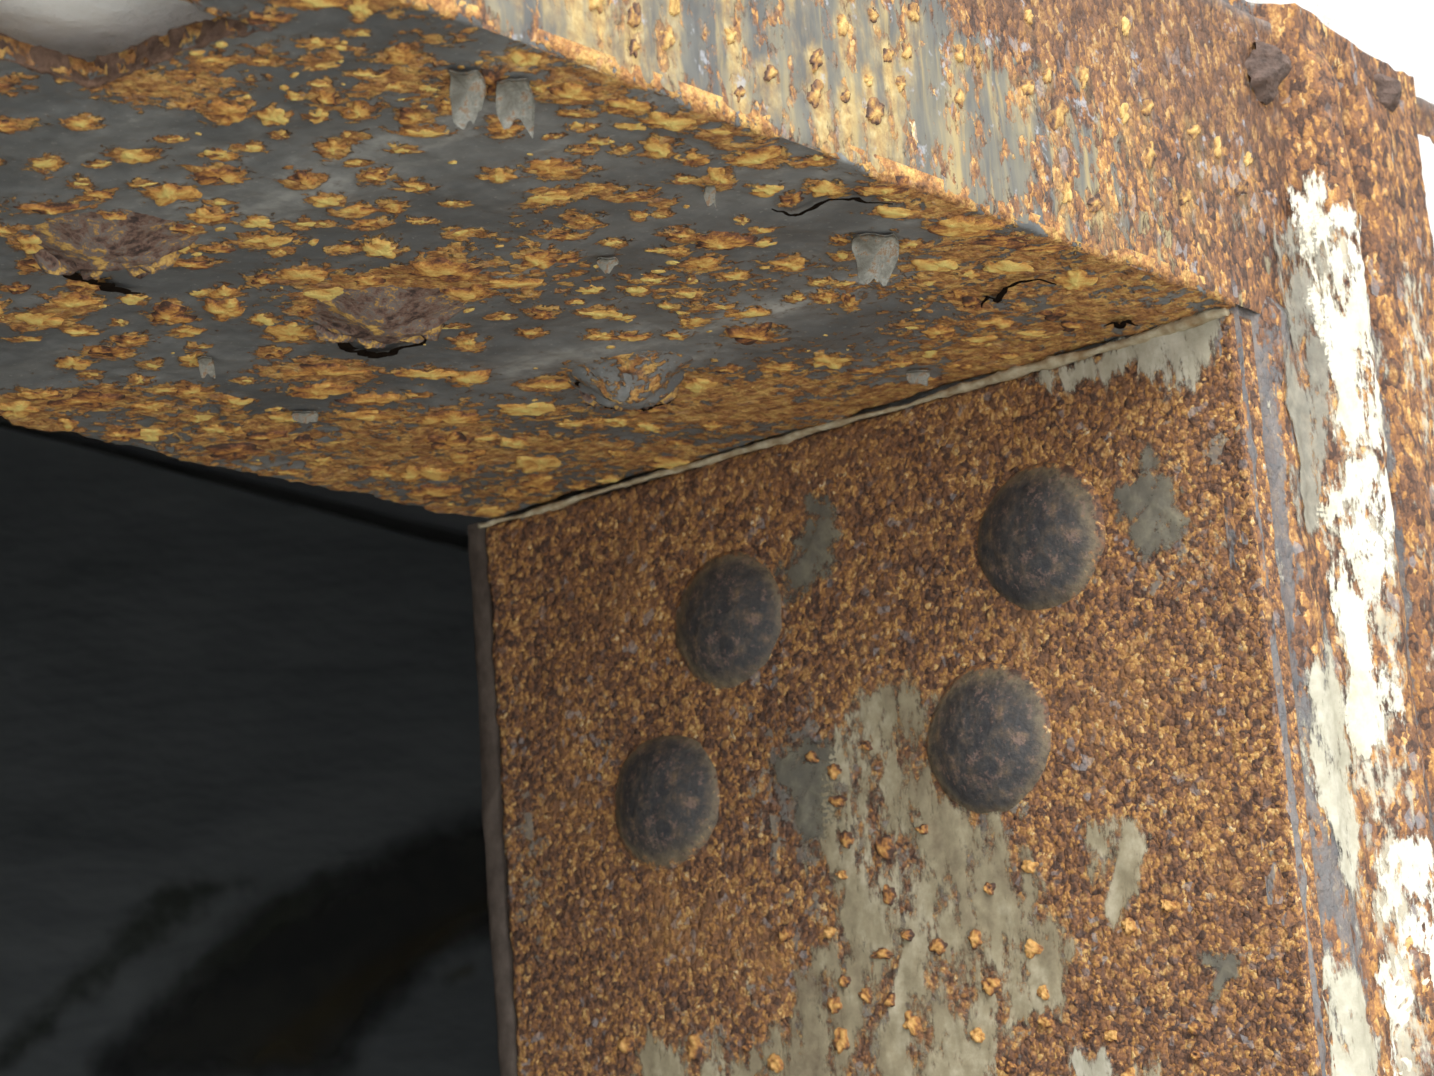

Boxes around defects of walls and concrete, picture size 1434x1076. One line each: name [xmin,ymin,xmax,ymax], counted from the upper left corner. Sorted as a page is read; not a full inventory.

corrosion [1024,9,1034,25]
corrosion [1121,16,1131,36]
corrosion [883,43,912,93]
corrosion [1078,66,1089,89]
corrosion [864,74,885,125]
corrosion [1020,68,1069,131]
corrosion [1120,98,1154,125]
corrosion [1145,141,1157,170]
corrosion [1062,182,1105,212]
corrosion [0,0,857,475]
corrosion [479,83,1087,382]
corrosion [1054,269,1098,291]